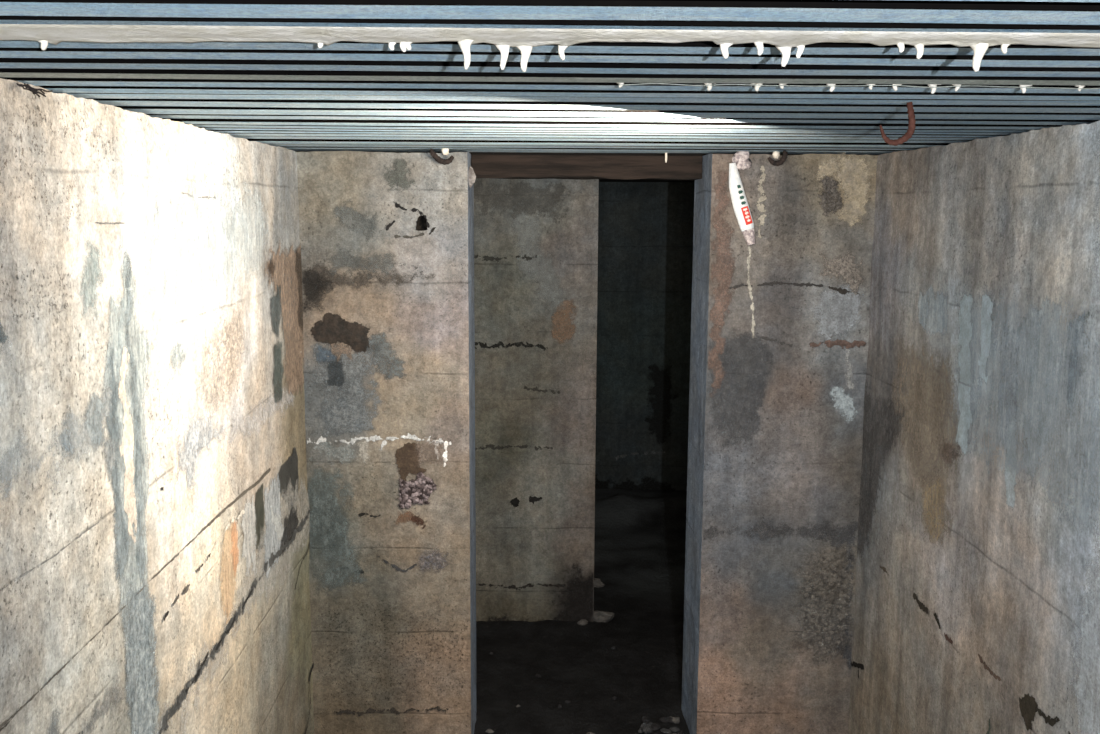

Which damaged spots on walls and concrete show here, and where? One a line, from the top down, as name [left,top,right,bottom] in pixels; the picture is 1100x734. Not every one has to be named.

damp [0,24,1100,72]
damp [334,201,376,240]
damp [709,166,772,446]
crack [0,468,271,731]
damp [0,242,452,734]
crack [160,509,310,734]
crack [305,662,314,734]
spalling [397,472,437,509]